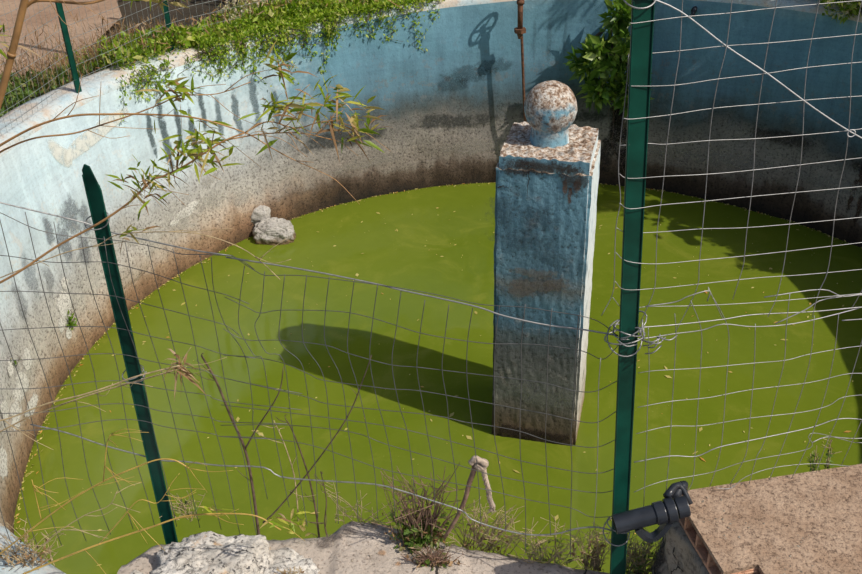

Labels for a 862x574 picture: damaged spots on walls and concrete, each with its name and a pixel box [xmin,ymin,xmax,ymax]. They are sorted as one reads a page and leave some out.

damp [416,115,489,128]
damp [309,129,384,149]
damp [753,128,809,147]